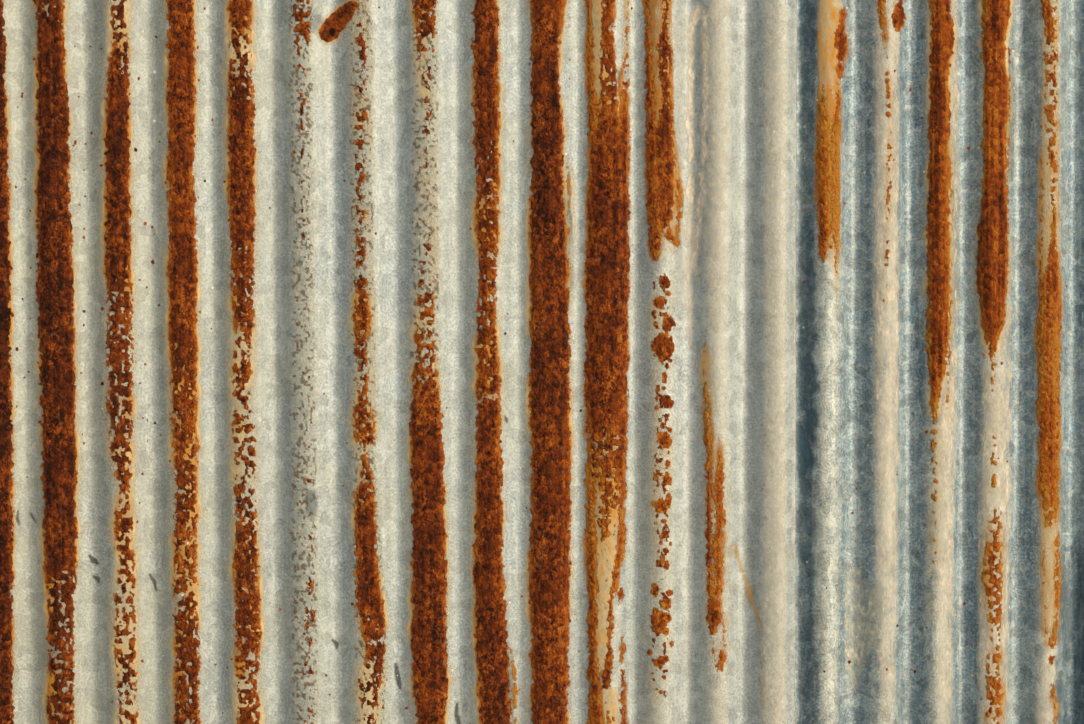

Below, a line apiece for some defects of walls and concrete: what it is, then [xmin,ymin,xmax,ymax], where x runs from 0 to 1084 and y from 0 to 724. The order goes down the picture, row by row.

rust [0,0,208,724]
rust [211,0,271,724]
rust [279,0,388,724]
rust [399,0,451,724]
rust [469,0,683,724]
rust [700,343,760,672]
rust [805,0,849,273]
rust [921,0,957,563]
rust [967,0,1013,392]
rust [981,509,1007,724]
rust [990,436,1008,488]
rust [1023,0,1069,665]